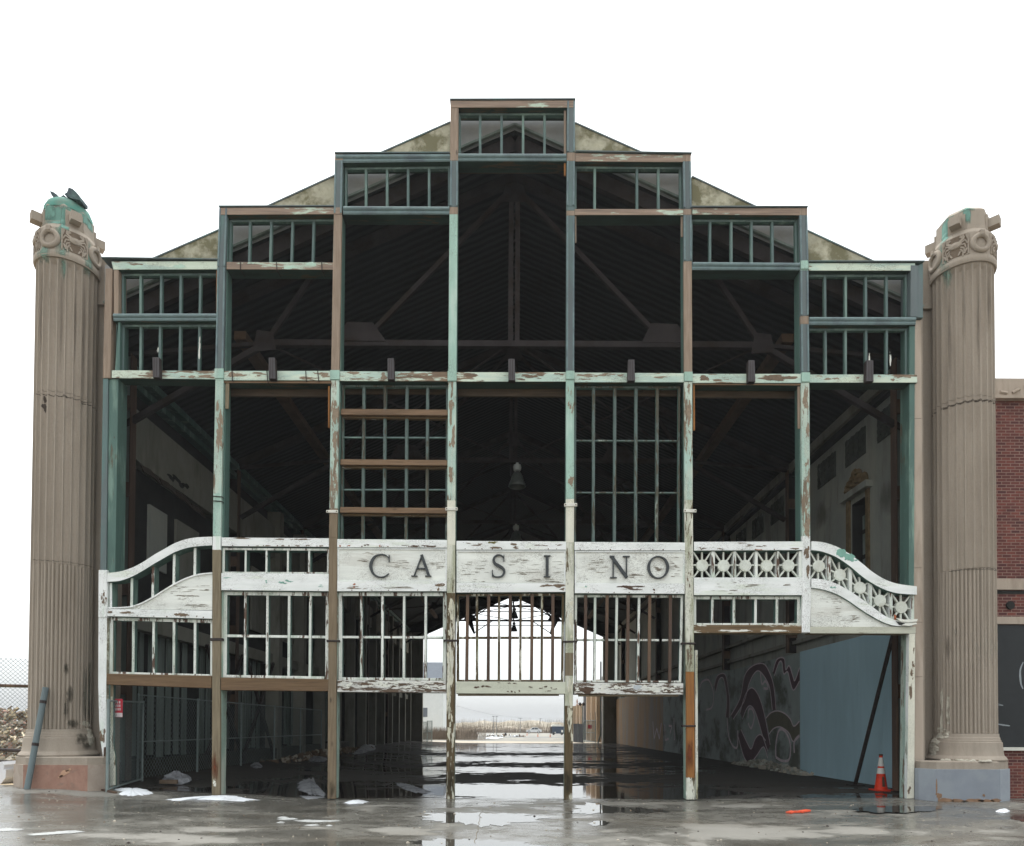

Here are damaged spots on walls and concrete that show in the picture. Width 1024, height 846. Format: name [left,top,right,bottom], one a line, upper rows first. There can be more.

peeling [330,467,338,495]
peeling [790,505,810,579]
peeling [836,549,858,562]